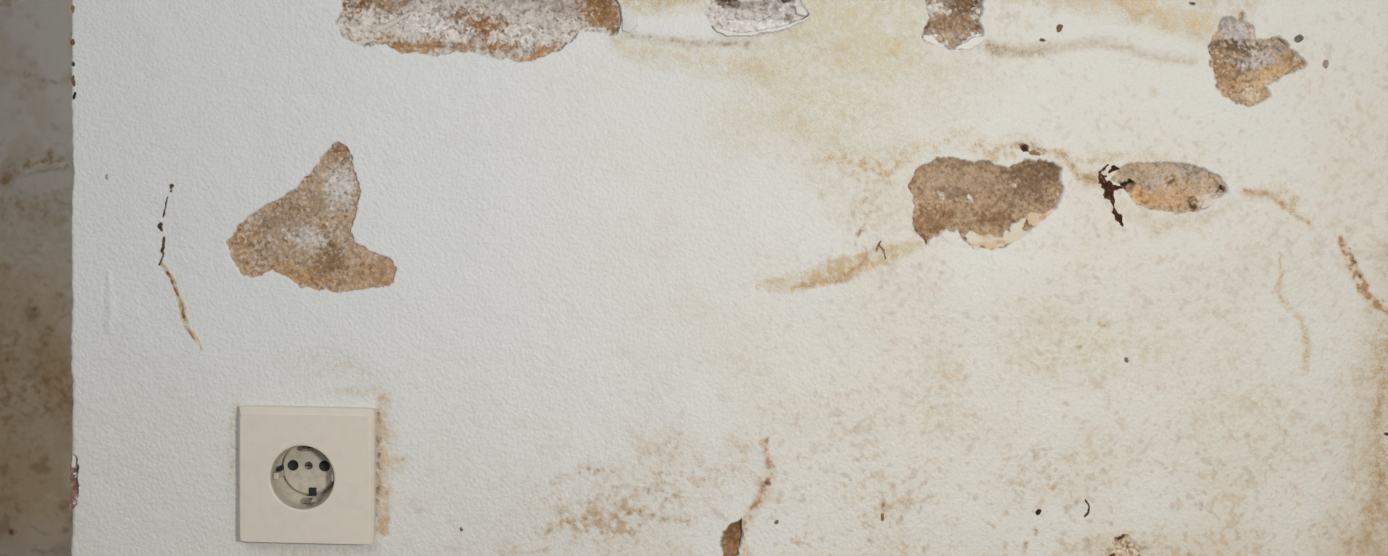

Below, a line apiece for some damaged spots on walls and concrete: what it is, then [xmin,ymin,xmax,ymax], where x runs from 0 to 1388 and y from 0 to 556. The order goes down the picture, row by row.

spalling [336,0,638,62]
spalling [706,0,810,37]
spalling [922,0,984,50]
spalling [1208,13,1329,107]
crack [157,184,174,265]
spalling [226,142,397,293]
spalling [908,150,1062,249]
spalling [1111,162,1226,214]
leakage [560,487,665,535]
spalling [721,519,742,556]